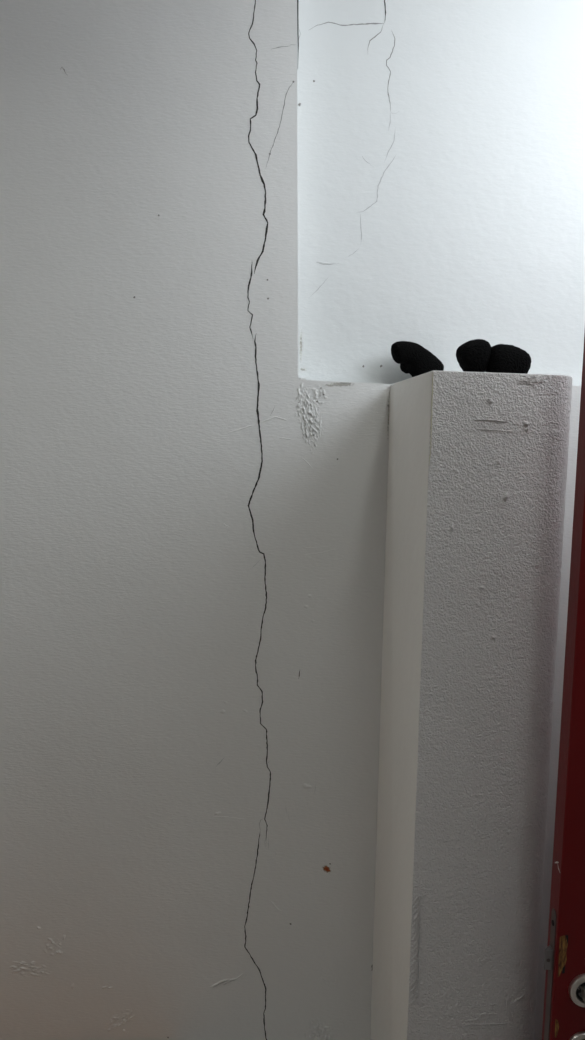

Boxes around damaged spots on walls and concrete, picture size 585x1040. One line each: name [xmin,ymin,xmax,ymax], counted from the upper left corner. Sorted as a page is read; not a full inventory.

crack [244,0,398,1040]